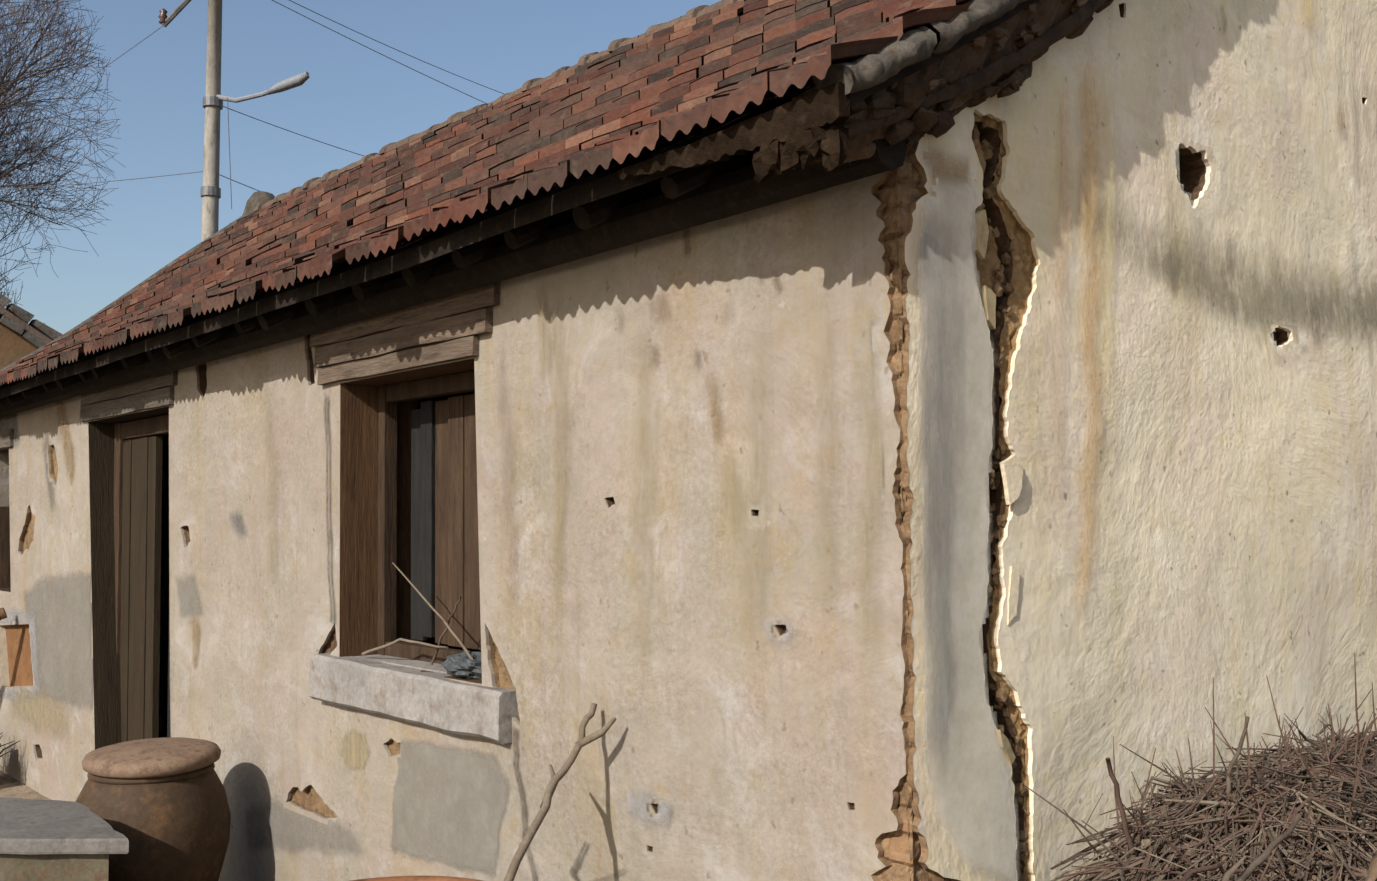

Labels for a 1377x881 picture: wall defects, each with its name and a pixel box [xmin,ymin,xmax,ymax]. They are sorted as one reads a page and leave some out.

water stain [1152,250,1377,333]
spalling [1270,326,1303,348]
spalling [48,444,58,485]
crack [971,109,1040,881]
spalling [17,505,35,555]
spalling [383,738,401,757]
spalling [286,785,340,819]